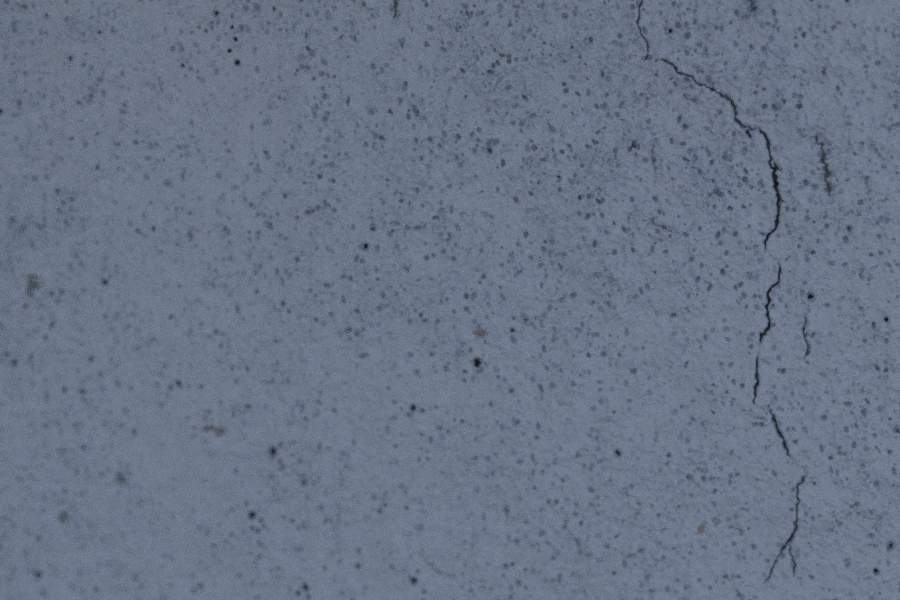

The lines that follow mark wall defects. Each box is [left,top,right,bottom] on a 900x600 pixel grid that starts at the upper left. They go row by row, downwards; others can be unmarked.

crack [636,1,790,456]
crack [765,476,806,583]